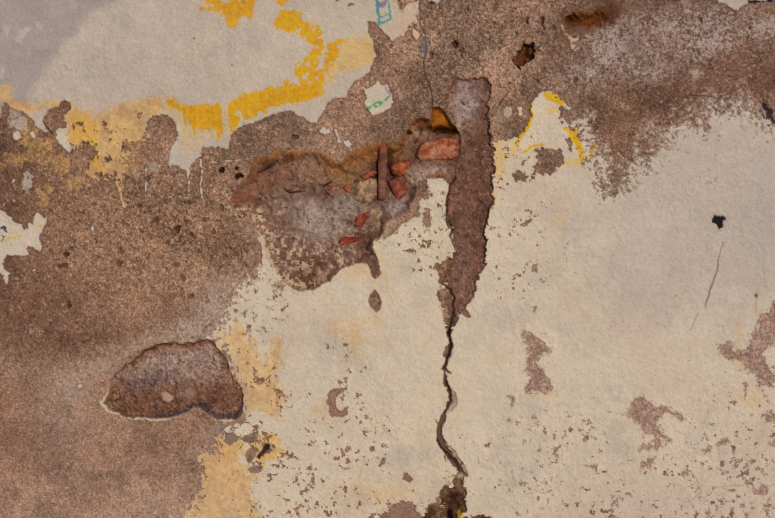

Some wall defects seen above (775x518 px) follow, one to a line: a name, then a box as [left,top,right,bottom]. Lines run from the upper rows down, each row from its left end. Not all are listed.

crack [419,0,434,109]
peeling [494,0,775,170]
spalling [512,137,573,183]
peeling [592,160,602,189]
peeling [0,0,498,518]
crack [436,327,468,475]
spalling [521,330,554,396]
spalling [626,397,685,469]
spalling [717,300,775,388]
spalling [589,498,618,518]
spalling [694,500,749,518]
spalling [701,439,772,517]